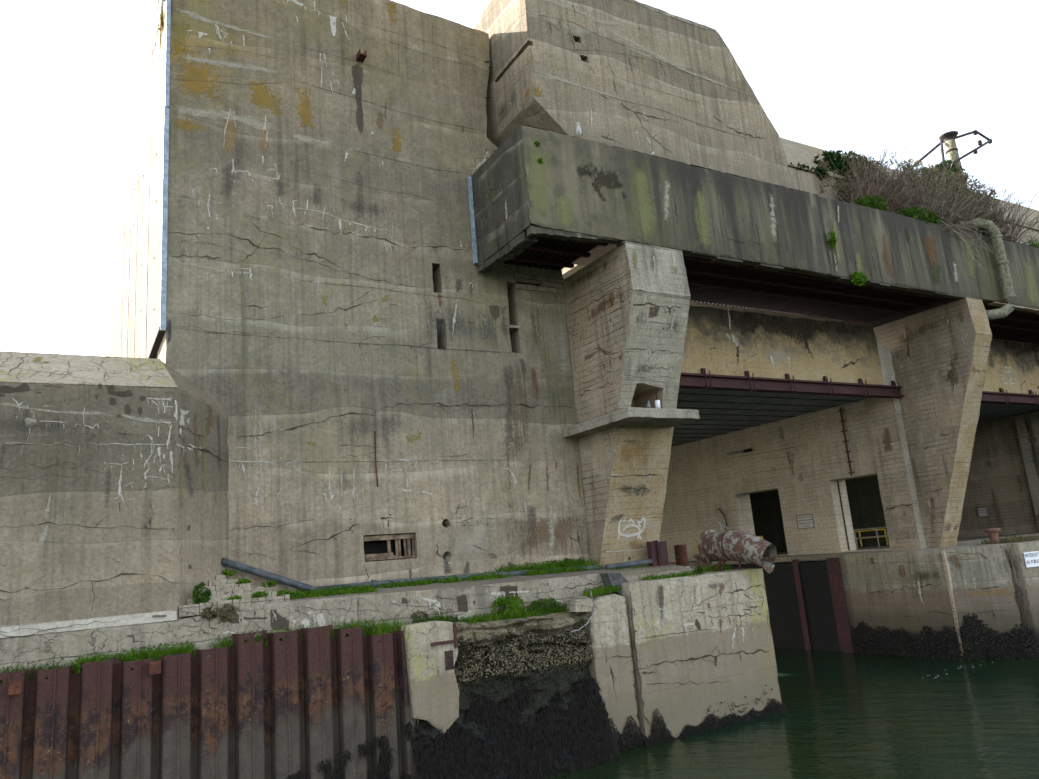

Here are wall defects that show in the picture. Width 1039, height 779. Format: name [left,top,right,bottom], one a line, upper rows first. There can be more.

water stain [351,65,387,135]
crack [150,147,515,338]
water stain [622,170,670,237]
water stain [770,197,795,237]
crack [0,351,159,481]
crack [178,425,227,463]
crack [238,284,681,461]
crack [611,474,665,494]
crack [0,485,647,651]
crack [586,574,769,724]